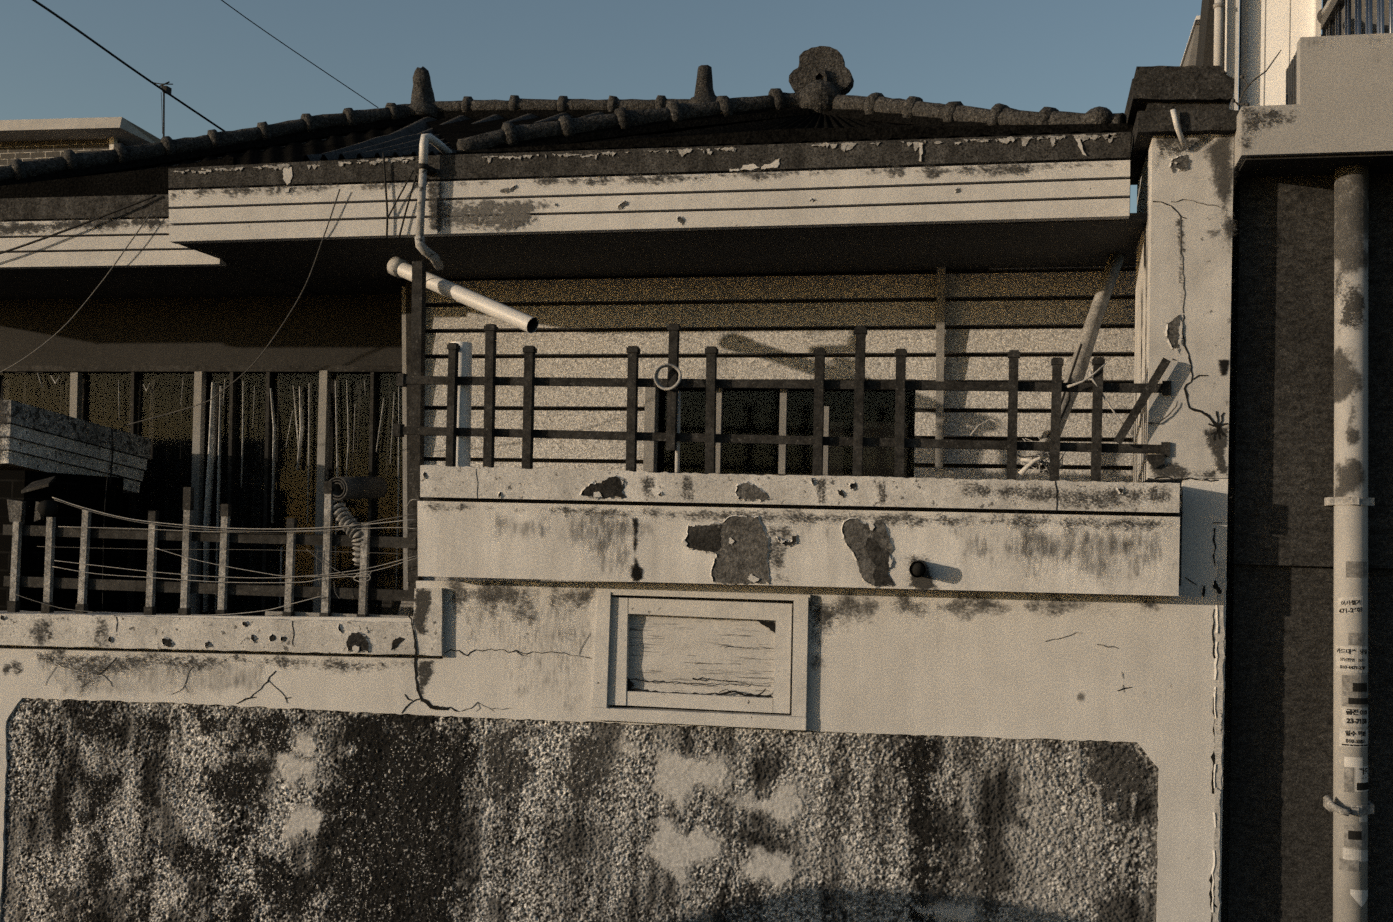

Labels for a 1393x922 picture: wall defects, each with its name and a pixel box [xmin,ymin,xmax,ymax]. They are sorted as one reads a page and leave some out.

peeling [901,133,1117,161]
leakage [171,169,824,232]
crack [1153,199,1228,440]
peeling [579,475,626,499]
peeling [681,481,798,585]
peeling [841,517,895,588]
leakage [550,427,1229,581]
crack [1147,475,1218,483]
crack [236,621,294,704]
crack [401,607,591,714]
leakage [41,703,536,922]
leakage [889,734,980,922]